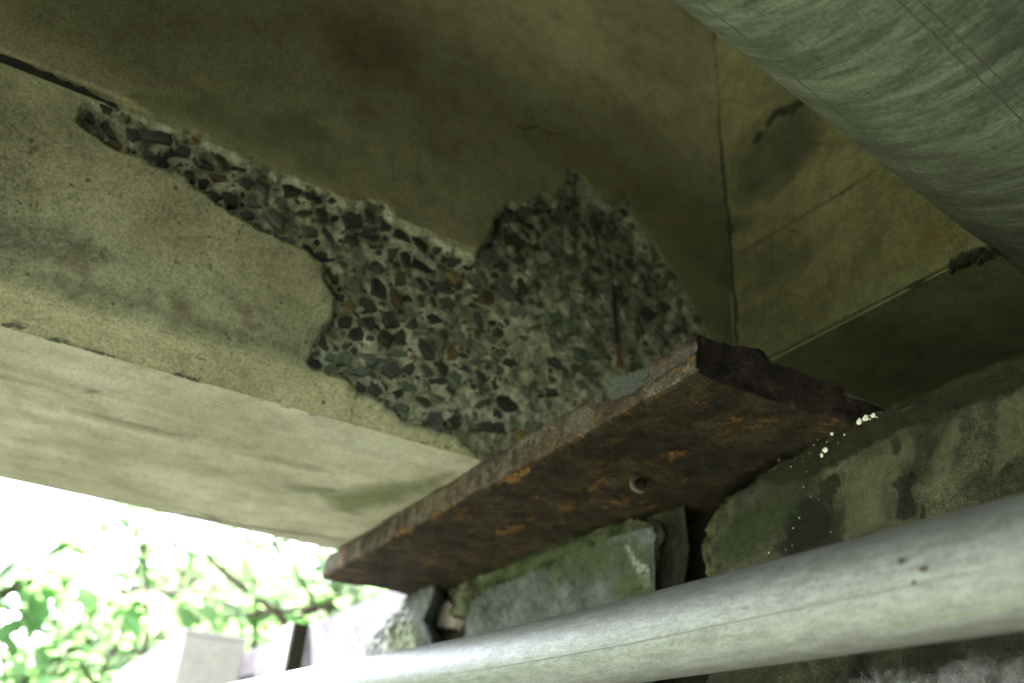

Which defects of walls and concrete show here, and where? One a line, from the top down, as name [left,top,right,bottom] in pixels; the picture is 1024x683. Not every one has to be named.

spalling [74,100,708,460]
crack [717,93,883,344]
damp [758,356,1024,555]